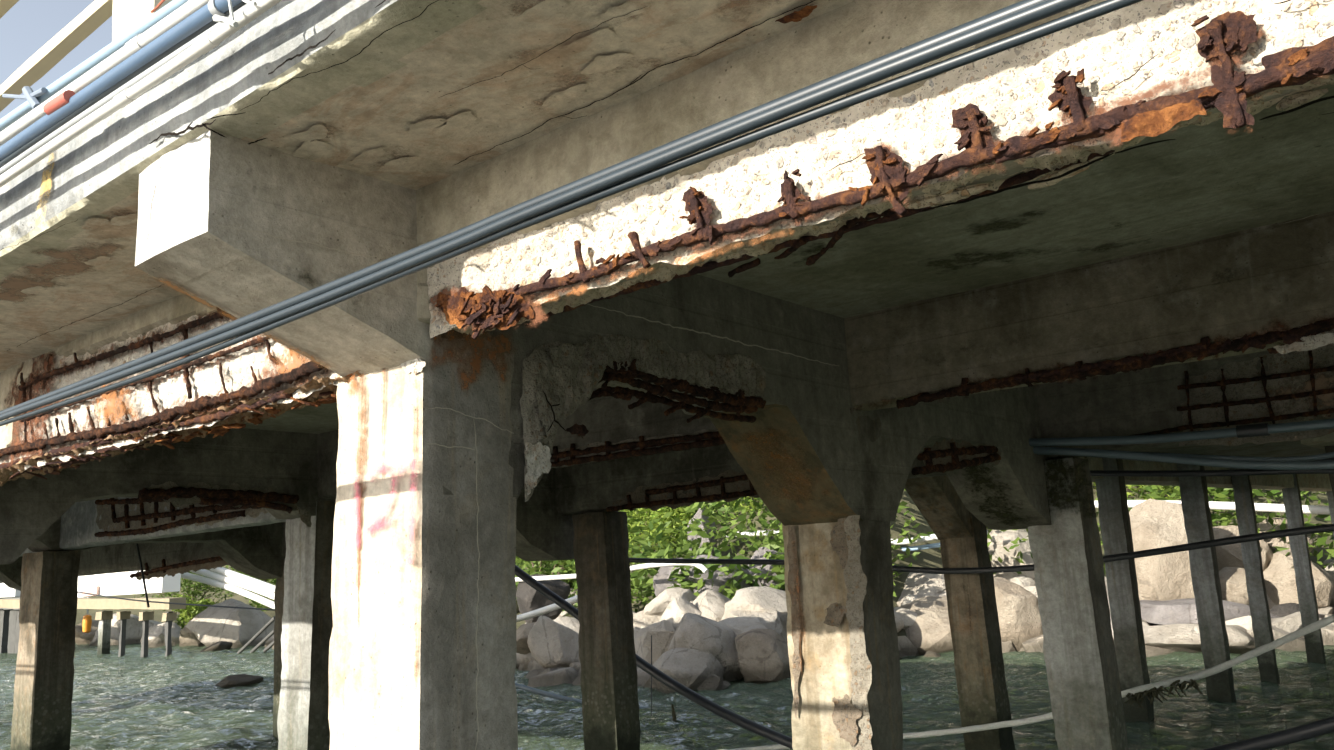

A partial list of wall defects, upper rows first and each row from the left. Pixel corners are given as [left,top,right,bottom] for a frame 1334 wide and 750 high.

crack [145,0,439,246]
crack [439,0,815,165]
corrosion [679,186,712,226]
spalling [427,0,1334,339]
corrosion [862,142,911,205]
corrosion [951,103,999,165]
corrosion [1019,11,1265,145]
corrosion [1257,36,1334,70]
spalling [0,307,363,487]
spalling [520,334,766,502]
spalling [896,315,1334,446]
spalling [606,470,759,512]